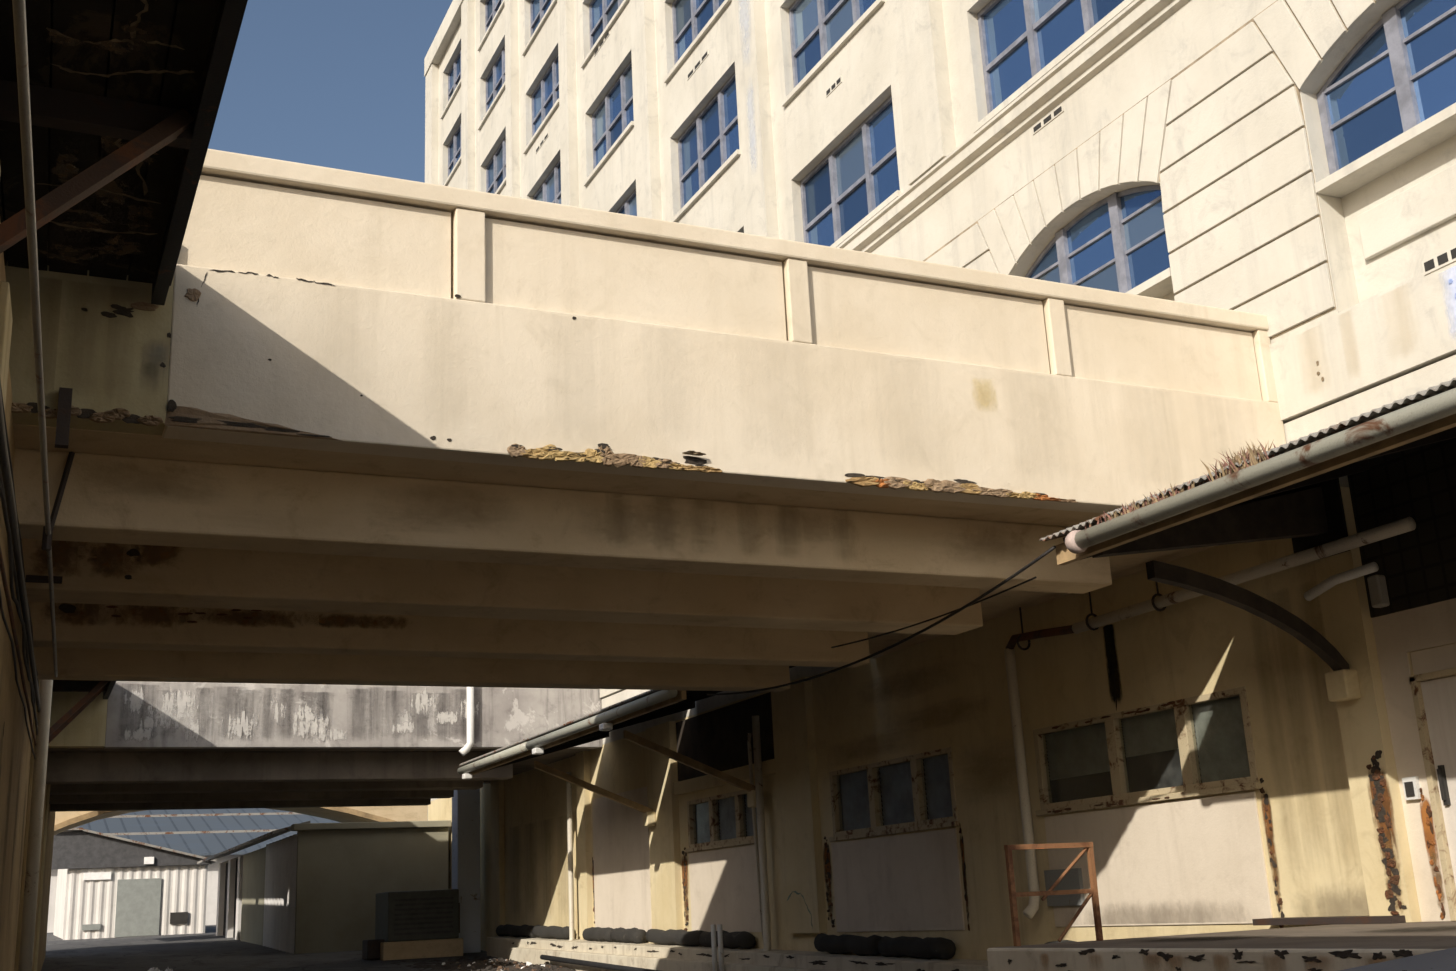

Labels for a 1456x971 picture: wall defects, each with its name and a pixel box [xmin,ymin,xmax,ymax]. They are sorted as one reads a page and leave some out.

crack [197,269,335,304]
peeling [164,399,342,441]
spalling [507,443,723,473]
spalling [845,473,1079,503]
corrosion [1259,778,1285,928]
corrosion [1419,788,1446,919]
spalling [1055,949,1095,971]
spalling [1139,949,1206,971]
spalling [1232,949,1255,963]
spalling [1274,949,1413,971]